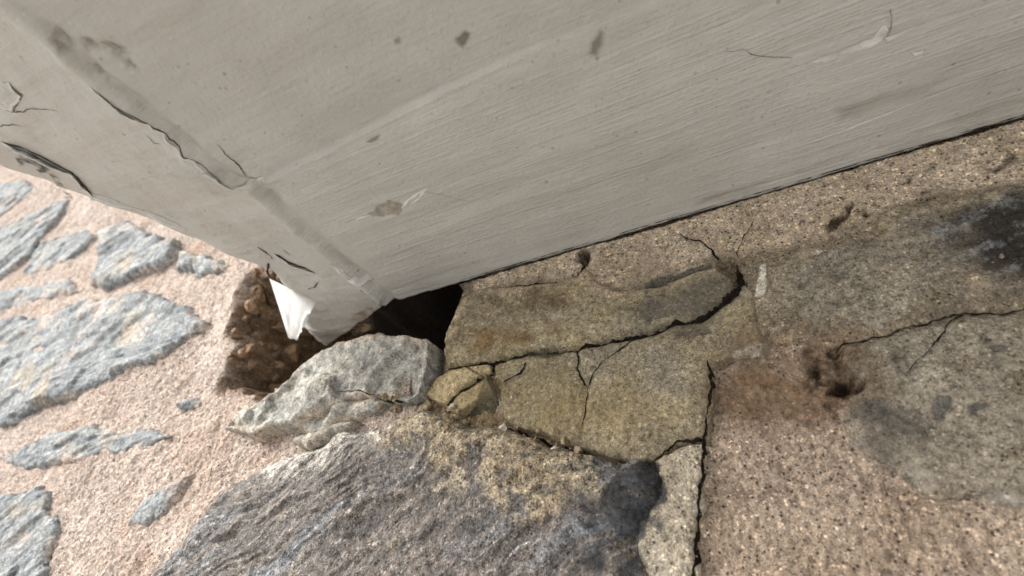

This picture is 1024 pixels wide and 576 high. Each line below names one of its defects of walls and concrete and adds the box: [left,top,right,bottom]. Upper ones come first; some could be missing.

crack [88,86,266,191]
peeling [351,189,427,222]
crack [447,114,1024,425]
crack [507,428,585,456]
crack [654,357,716,576]